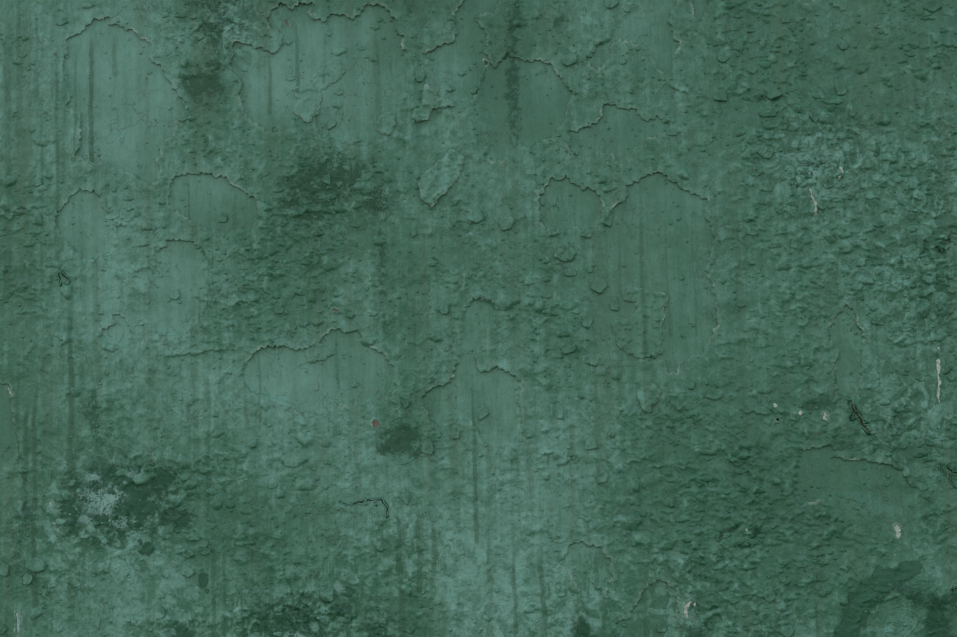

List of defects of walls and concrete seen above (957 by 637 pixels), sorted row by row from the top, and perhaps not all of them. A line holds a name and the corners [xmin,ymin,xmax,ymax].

peeling [53,12,264,338]
peeling [224,0,724,413]
peeling [239,323,401,430]
peeling [416,292,527,452]
peeling [555,535,619,601]